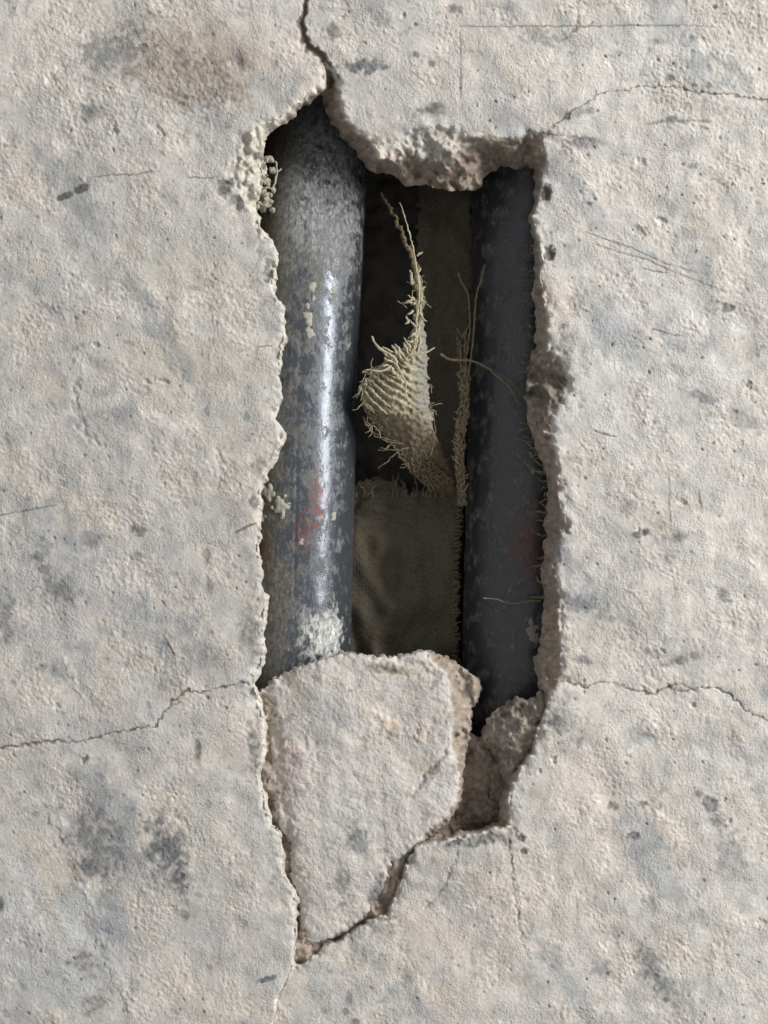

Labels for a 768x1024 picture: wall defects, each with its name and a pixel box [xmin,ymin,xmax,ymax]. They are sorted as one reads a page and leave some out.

crack [297,0,338,80]
crack [543,101,589,139]
crack [682,87,768,100]
spalling [233,63,571,966]
crack [0,682,249,749]
crack [628,683,763,718]